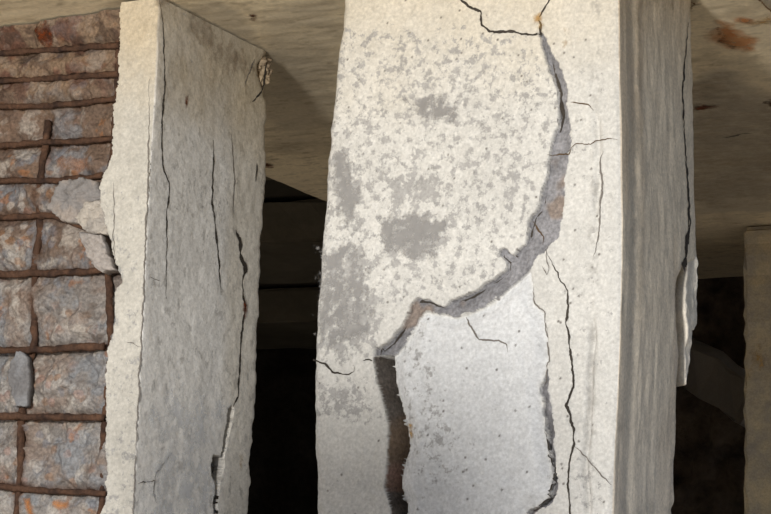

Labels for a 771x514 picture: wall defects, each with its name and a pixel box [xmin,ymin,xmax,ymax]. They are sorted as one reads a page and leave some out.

corrosion [34,21,53,47]
spalling [0,9,122,514]
crack [211,134,248,514]
crack [313,0,617,514]
crack [682,2,695,271]
corrosion [718,26,753,49]